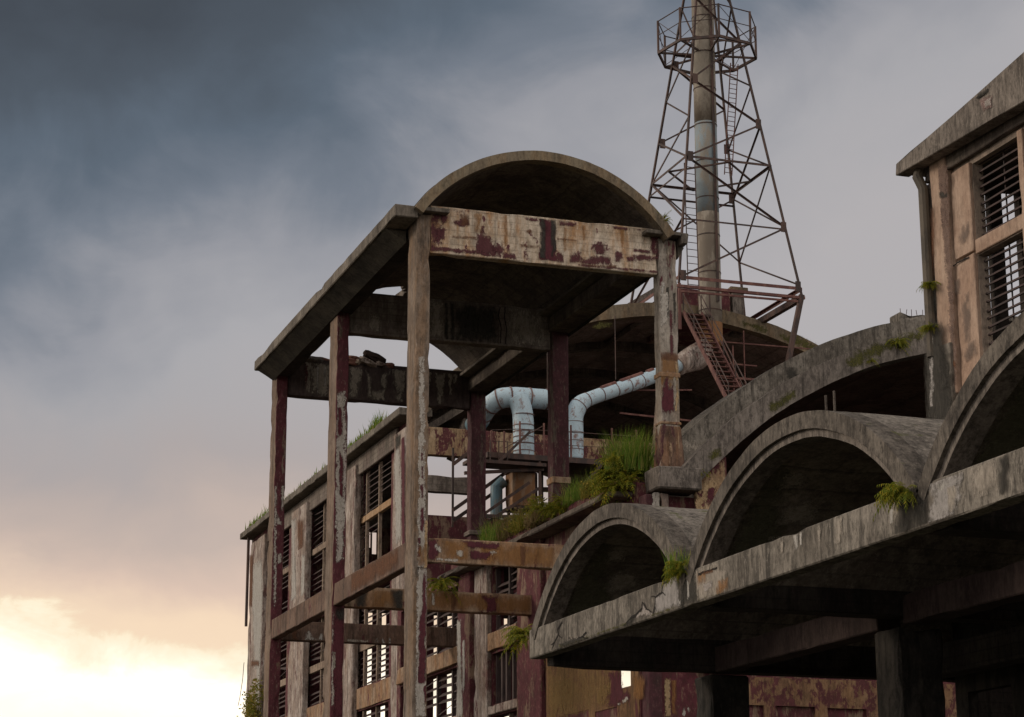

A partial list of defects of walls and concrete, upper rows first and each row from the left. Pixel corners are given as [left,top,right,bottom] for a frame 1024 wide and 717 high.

peeling [431,210,659,273]
peeling [660,292,679,412]
peeling [335,391,347,563]
peeling [394,356,499,717]
peeling [331,608,344,717]
crack [551,621,588,650]
crack [651,581,667,613]